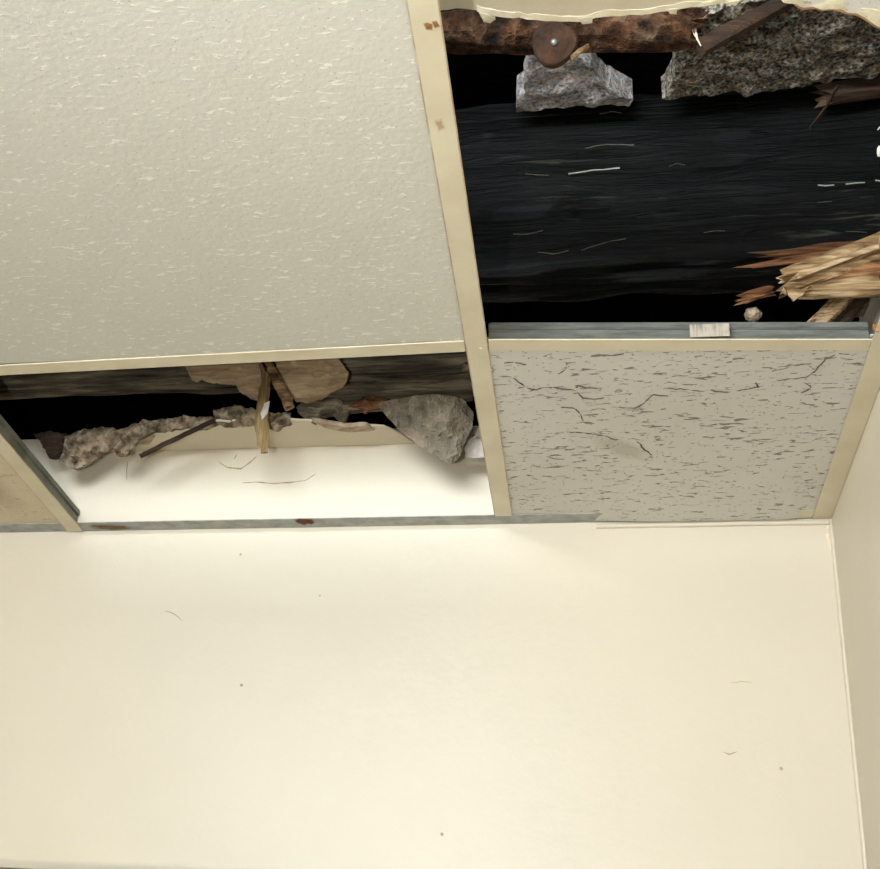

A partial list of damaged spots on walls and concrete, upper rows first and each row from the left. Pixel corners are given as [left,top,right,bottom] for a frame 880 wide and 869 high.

flaking render [477,0,741,24]
peeling [782,0,847,10]
peeling [858,8,880,27]
peeling [784,285,809,302]
crack [498,355,835,455]
flaking render [131,417,415,452]